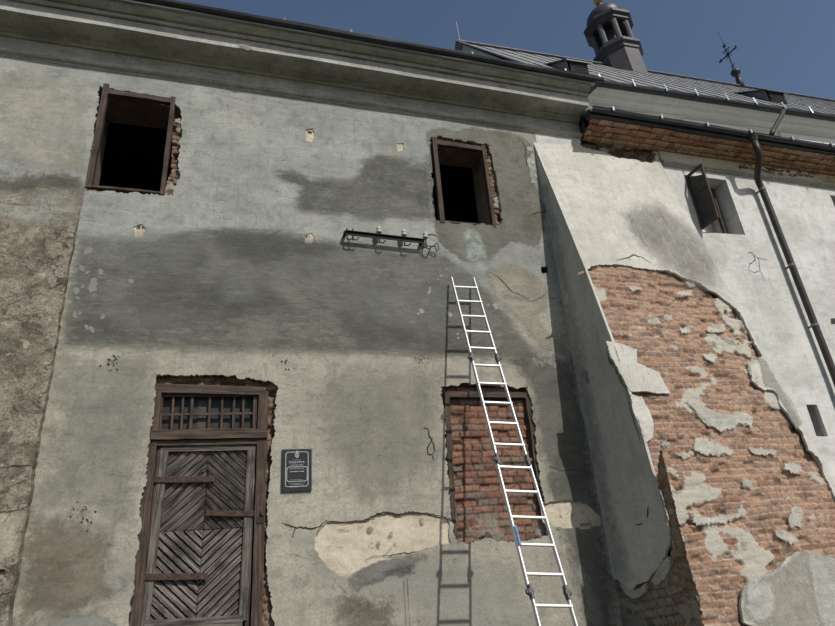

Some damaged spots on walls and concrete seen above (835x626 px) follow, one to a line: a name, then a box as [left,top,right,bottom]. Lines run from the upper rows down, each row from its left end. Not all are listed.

leakage [0,175,79,193]
leakage [282,141,432,219]
flaking render [580,137,653,163]
leakage [64,230,600,514]
crack [424,427,435,460]
flaking render [578,266,835,626]
flaking render [0,512,24,575]
spalling [156,376,278,626]
crack [284,523,322,536]
flaking render [314,511,451,577]
leakage [558,526,614,626]